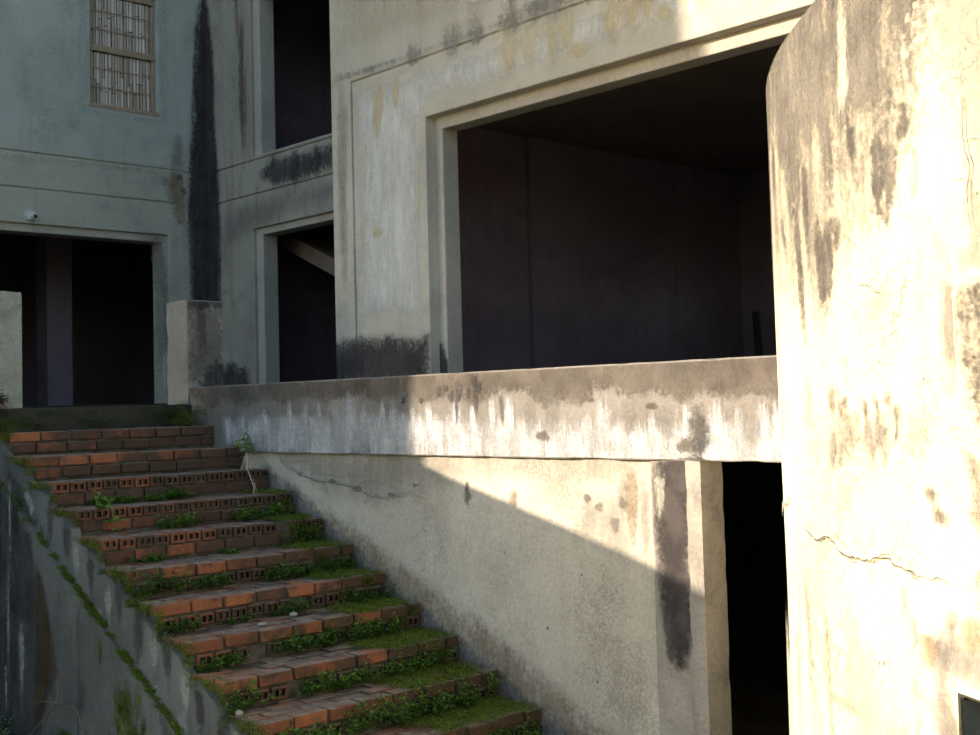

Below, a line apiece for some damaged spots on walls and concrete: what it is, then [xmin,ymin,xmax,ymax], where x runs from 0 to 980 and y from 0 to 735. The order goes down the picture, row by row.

water stain [766,0,935,329]
crack [951,96,980,244]
water stain [264,466,588,735]
water stain [164,0,782,669]
water stain [827,390,898,467]
crack [802,525,943,586]